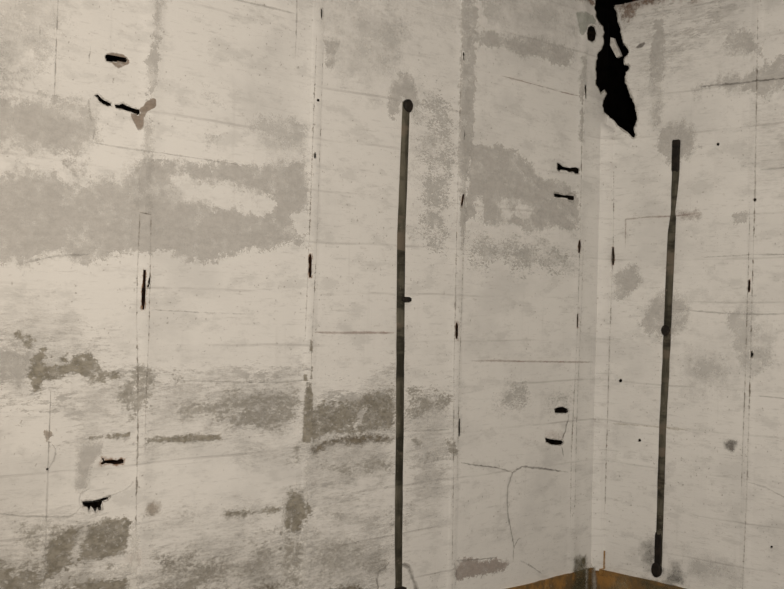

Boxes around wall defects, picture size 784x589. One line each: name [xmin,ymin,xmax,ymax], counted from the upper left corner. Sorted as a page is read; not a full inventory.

water stain [0,95,96,152]
water stain [145,36,162,70]
water stain [459,0,580,232]
spalling [584,0,652,138]
water stain [0,151,308,265]